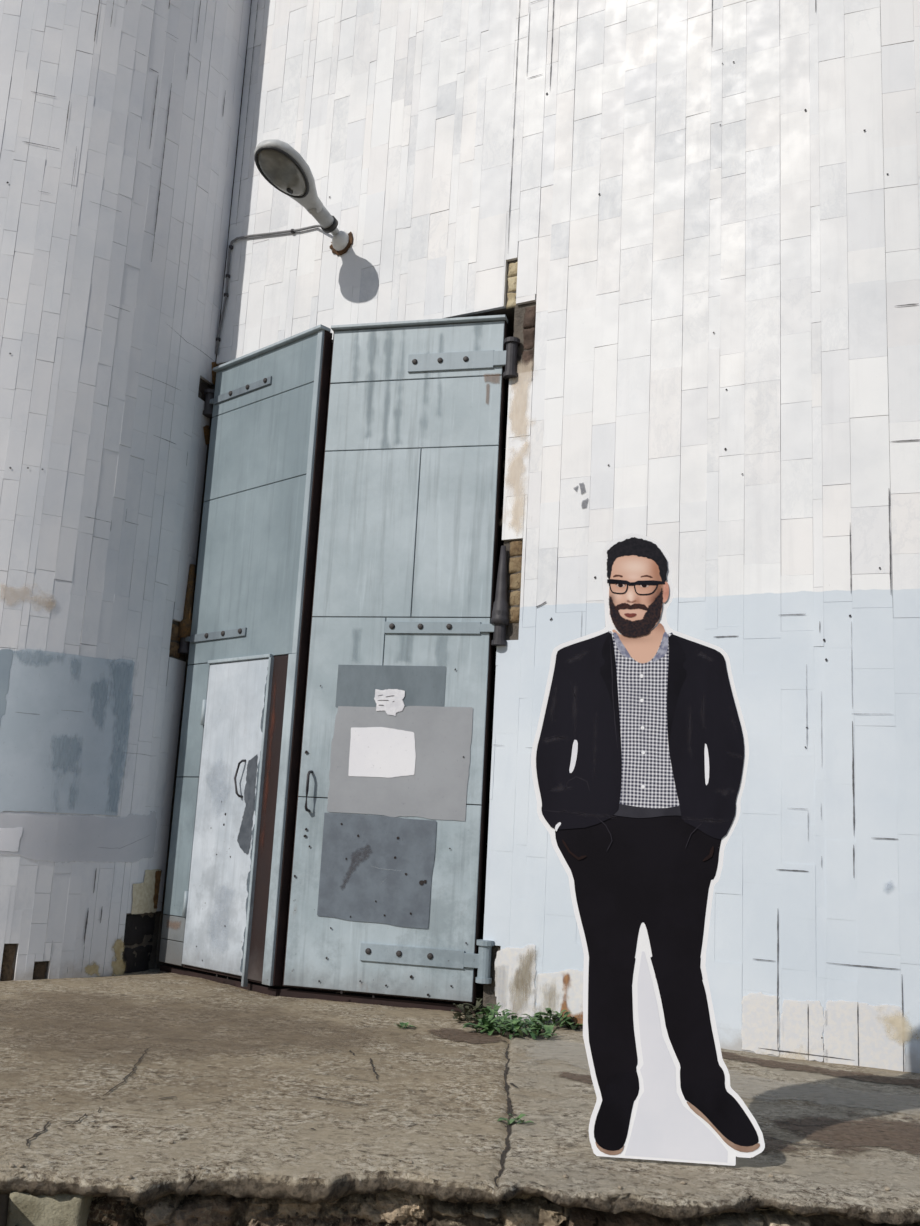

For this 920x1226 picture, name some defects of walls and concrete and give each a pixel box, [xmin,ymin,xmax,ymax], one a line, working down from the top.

spalling [506,261,536,370]
spalling [508,540,523,623]
spalling [0,944,16,981]
spalling [33,962,47,979]
spalling [122,869,161,974]
damp [511,952,534,1013]
rust [561,974,583,1028]
crack [26,1037,215,1147]
crack [494,1044,518,1187]